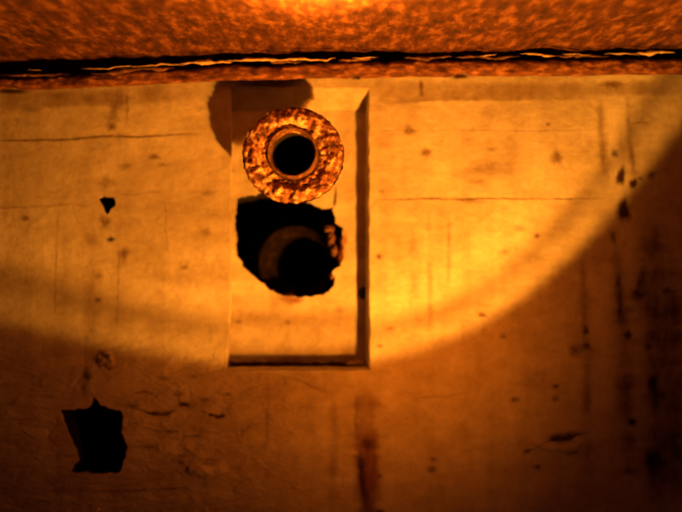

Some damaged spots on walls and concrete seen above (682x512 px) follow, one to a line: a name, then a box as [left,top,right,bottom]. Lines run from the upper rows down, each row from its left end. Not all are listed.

spalling [98,196,116,215]
spalling [61,397,128,474]